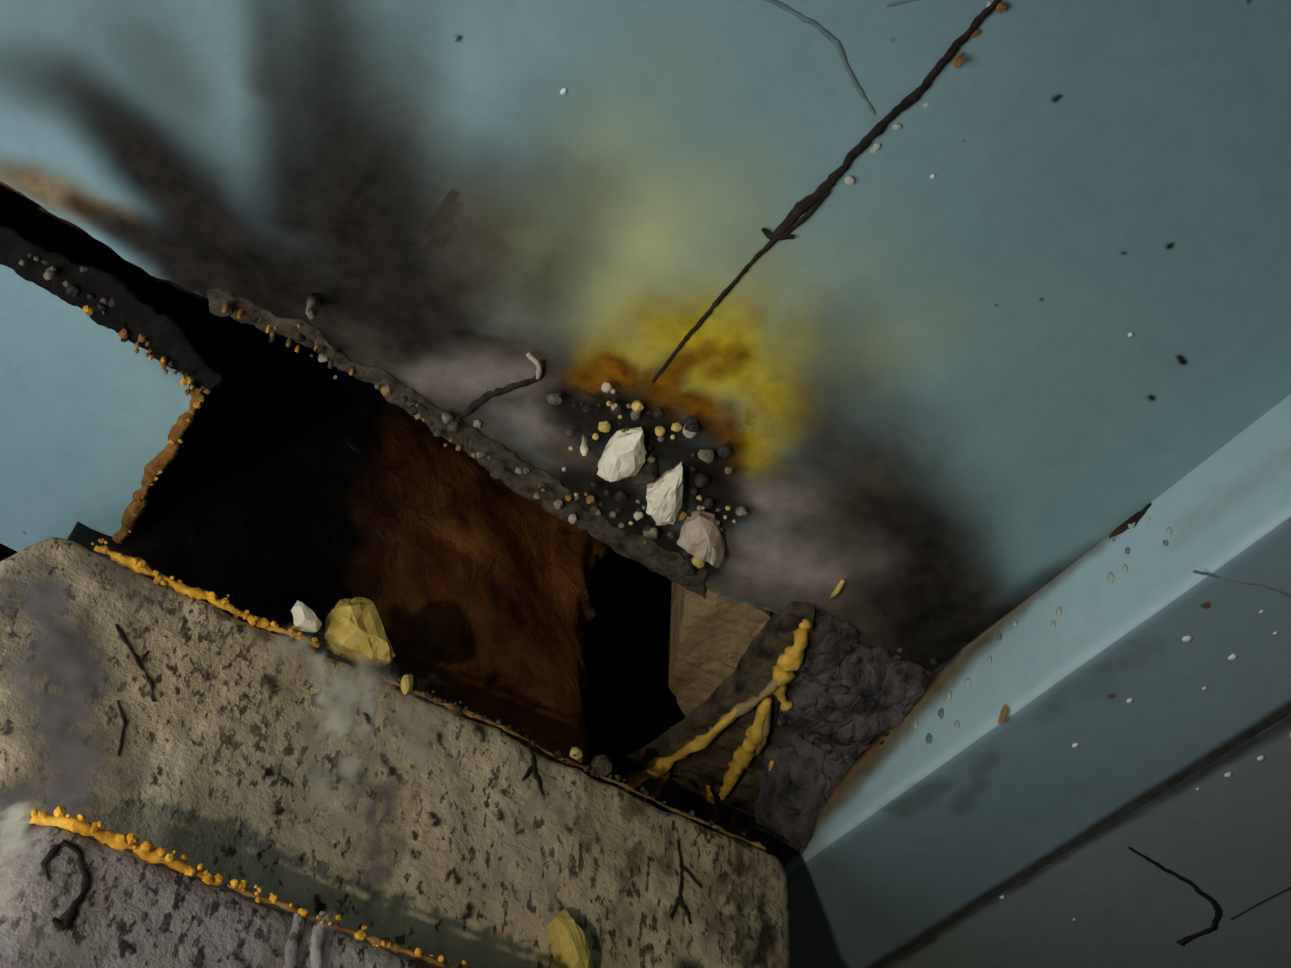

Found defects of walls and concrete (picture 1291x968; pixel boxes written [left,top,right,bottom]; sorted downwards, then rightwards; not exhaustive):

crack [652,0,1007,383]
leakage [571,190,707,344]
peeling [186,389,211,422]
flaking render [413,351,542,394]
leakage [566,350,850,597]
flaking render [91,539,320,648]
flaking render [264,676,280,694]
flaking render [377,671,767,850]
crack [40,839,92,932]
flaking render [462,902,473,919]
crack [670,839,702,924]
crack [1128,846,1291,946]